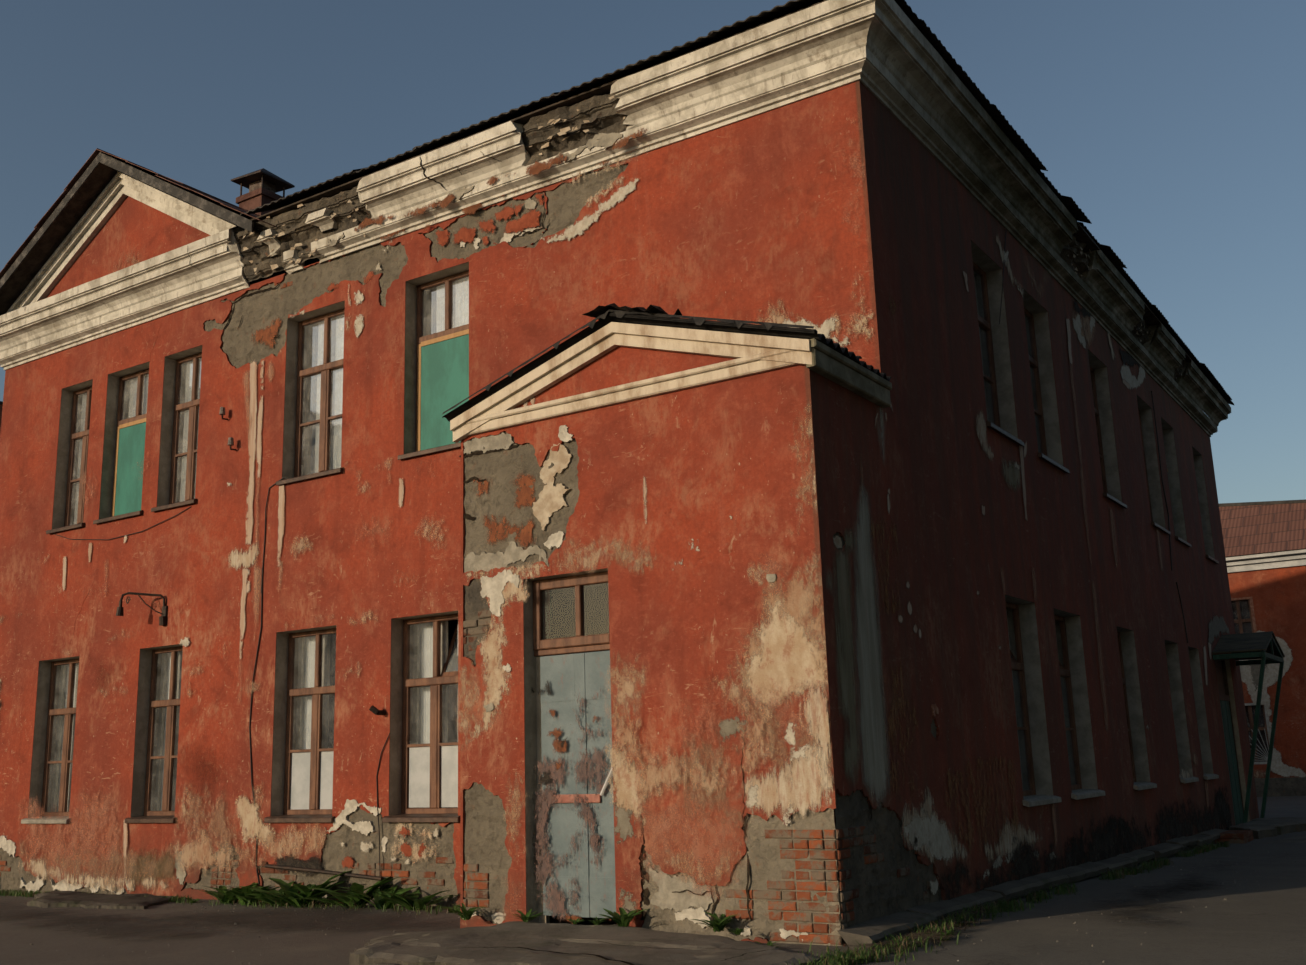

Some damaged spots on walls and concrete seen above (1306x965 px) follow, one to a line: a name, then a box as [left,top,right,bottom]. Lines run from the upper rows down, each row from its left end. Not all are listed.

spalling [424,94,638,261]
flaking render [204,186,408,369]
peeling [759,301,873,346]
flaking render [1072,300,1145,390]
damp [244,360,273,545]
damp [239,568,260,659]
flaking render [458,425,651,743]
flaking render [605,561,967,946]
damp [829,478,889,799]
peeling [1239,630,1306,778]
flaking render [0,782,520,924]
damp [941,780,1232,900]